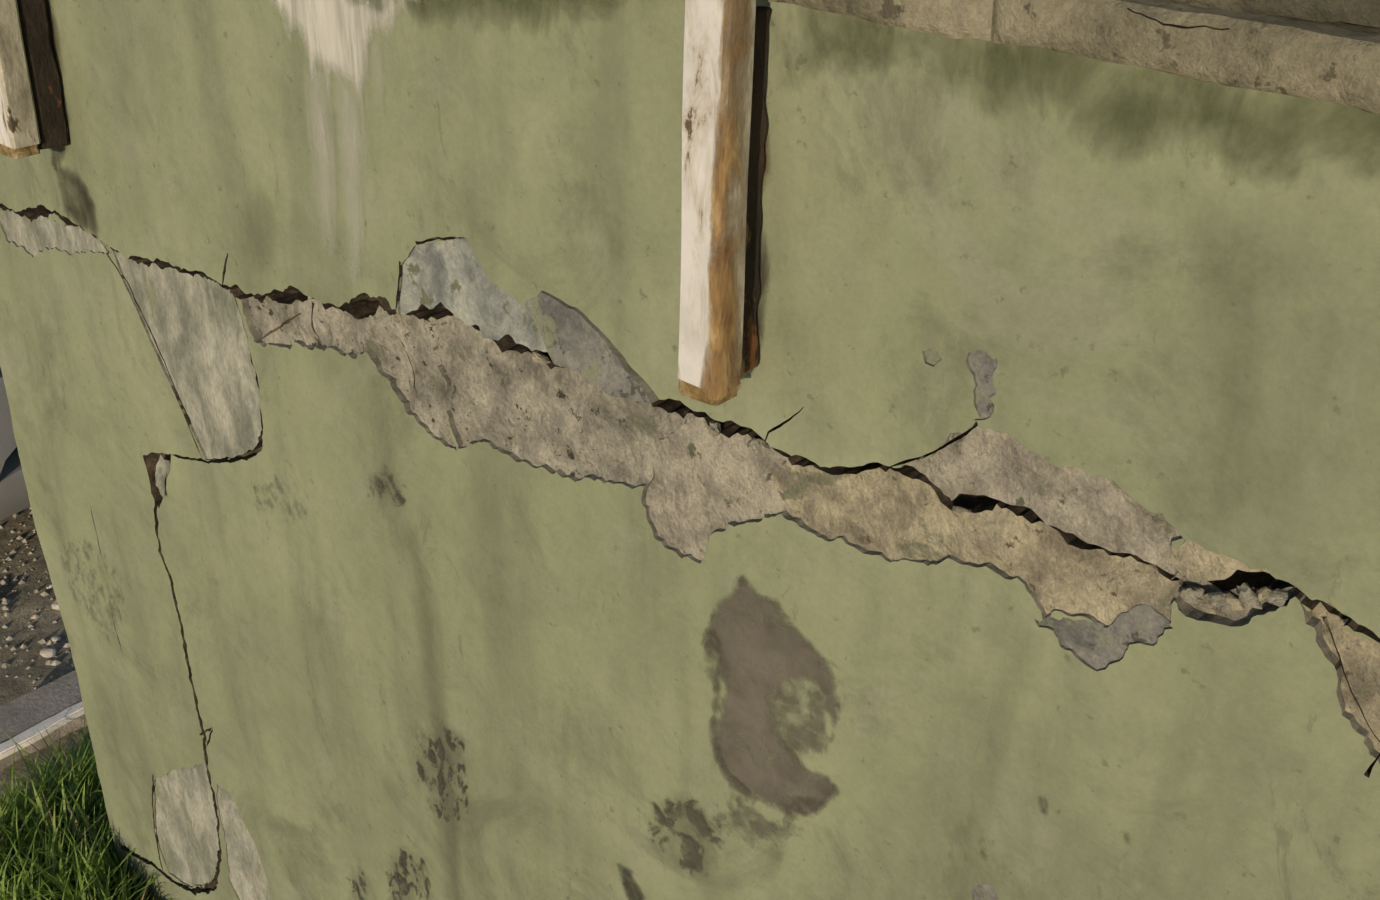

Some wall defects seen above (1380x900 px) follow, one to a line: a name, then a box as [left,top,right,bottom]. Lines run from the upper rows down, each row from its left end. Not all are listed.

water stain [277,0,394,86]
crack [261,314,301,340]
crack [155,453,171,498]
crack [228,447,263,458]
spalling [0,206,1299,670]
crack [936,424,978,450]
crack [951,495,988,521]
crack [1179,569,1291,614]
spalling [1312,601,1380,753]
water stain [651,578,838,874]
crack [1358,703,1380,771]
peeling [155,763,271,900]